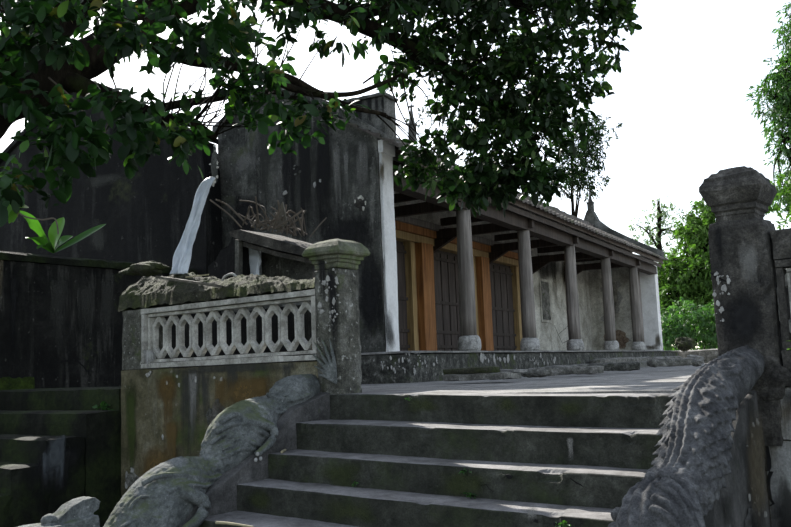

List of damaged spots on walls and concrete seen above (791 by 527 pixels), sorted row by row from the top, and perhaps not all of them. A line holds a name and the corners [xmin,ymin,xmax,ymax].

damp [231,133,269,231]
damp [278,122,369,245]
peeling [317,261,339,326]
damp [360,254,394,344]
peeling [712,271,731,322]
damp [177,363,266,435]
peeling [381,353,438,375]
peeling [480,352,515,364]